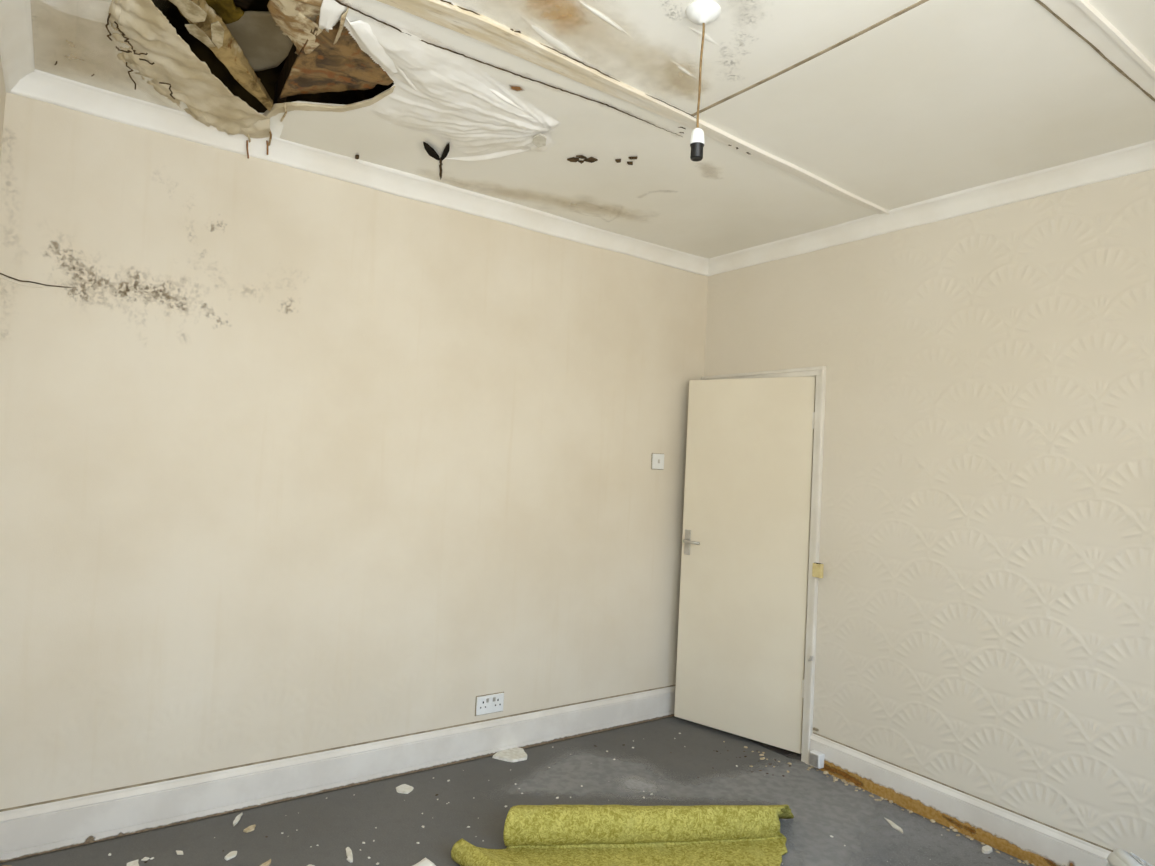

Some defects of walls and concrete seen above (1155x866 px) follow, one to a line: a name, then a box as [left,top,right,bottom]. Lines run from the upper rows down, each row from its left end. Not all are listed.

spalling [216,118,270,138]
crack [0,273,73,288]